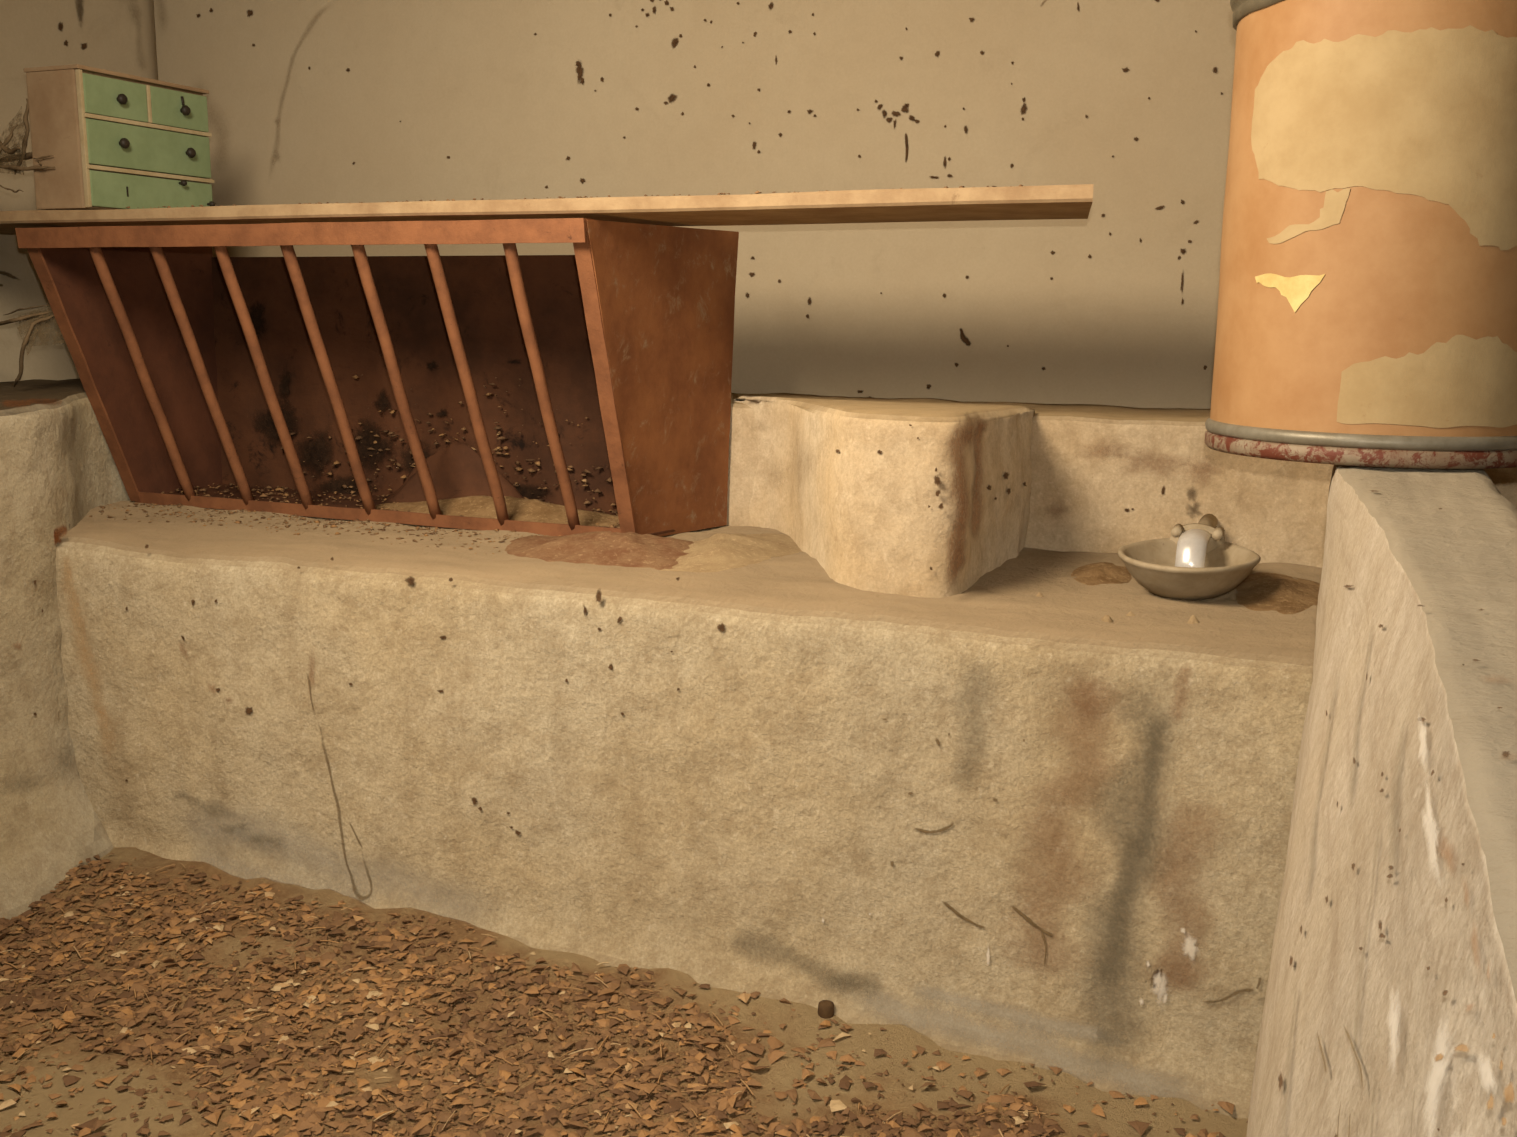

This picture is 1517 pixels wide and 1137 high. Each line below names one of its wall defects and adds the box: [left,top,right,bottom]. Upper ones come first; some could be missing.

rust [948,423,984,576]
crack [327,760,372,900]
damp [866,725,1176,1097]
damp [1181,928,1196,959]